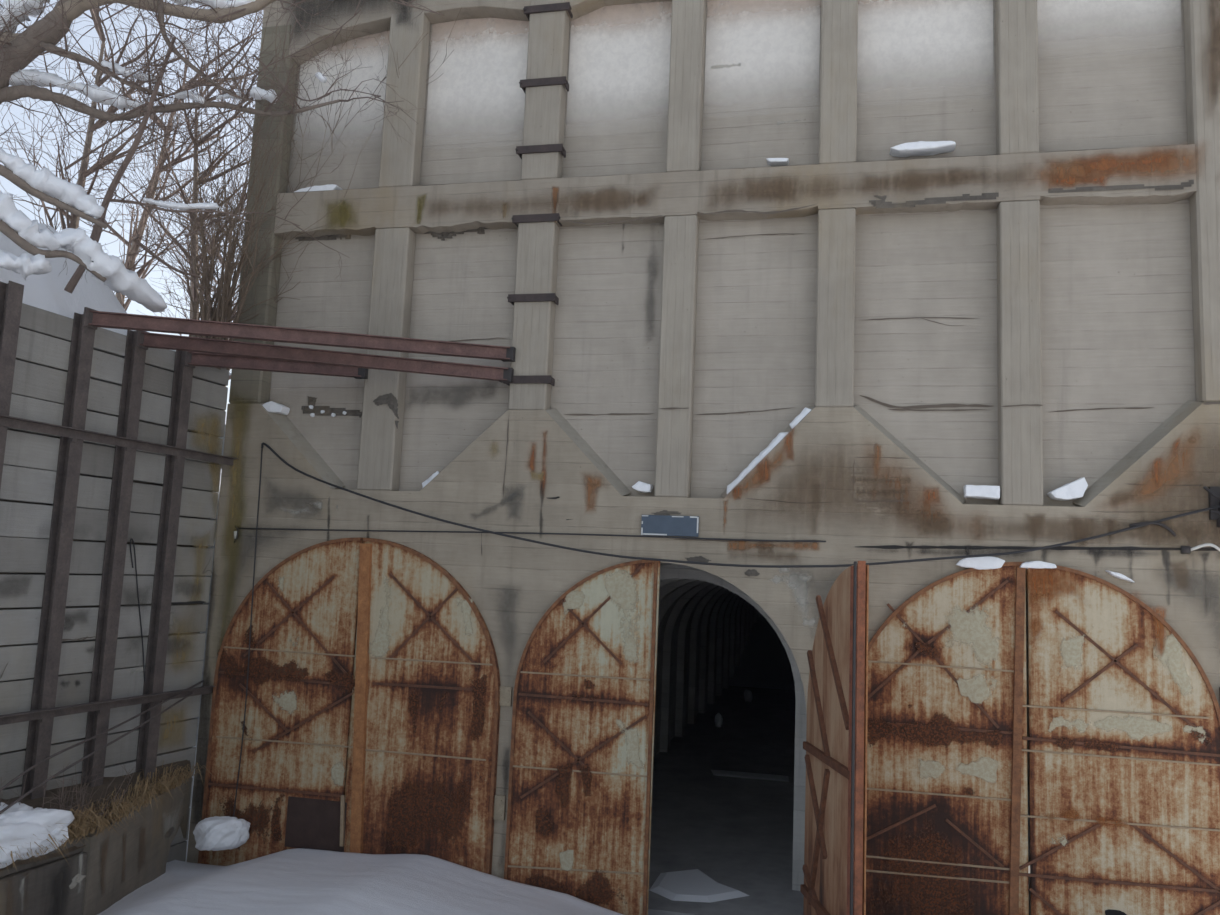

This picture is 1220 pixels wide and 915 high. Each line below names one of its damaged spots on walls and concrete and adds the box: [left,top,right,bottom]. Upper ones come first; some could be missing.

corrosion [1040,152,1196,186]
corrosion [724,433,792,524]
corrosion [1030,571,1072,599]
corrosion [217,625,355,695]
corrosion [469,674,487,740]
corrosion [867,704,1011,748]
corrosion [1055,737,1119,754]
corrosion [555,763,592,808]
corrosion [219,791,285,844]
corrosion [384,772,487,854]
corrosion [525,869,626,906]
corrosion [866,821,978,915]